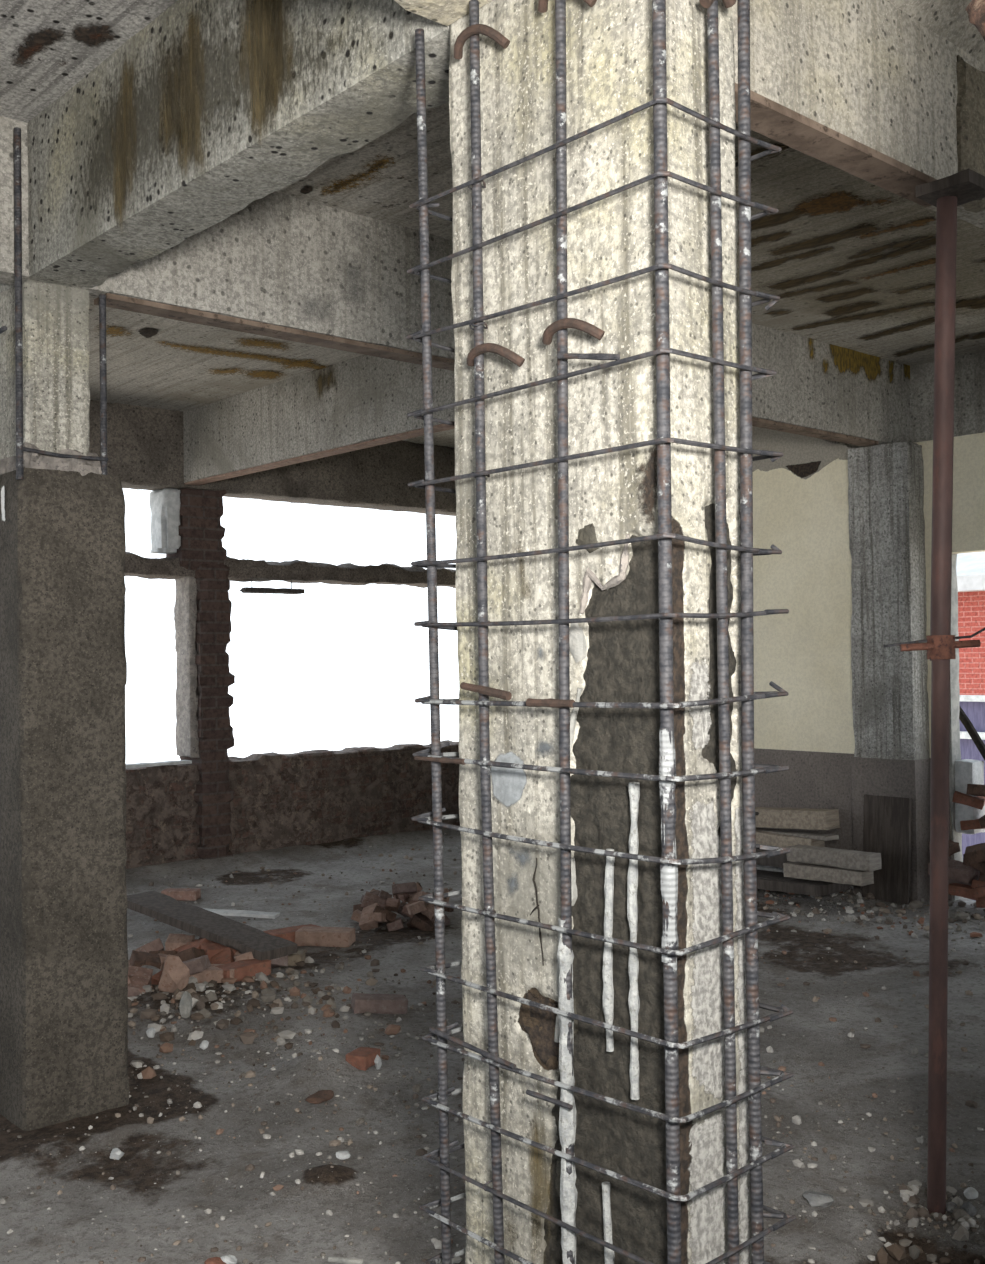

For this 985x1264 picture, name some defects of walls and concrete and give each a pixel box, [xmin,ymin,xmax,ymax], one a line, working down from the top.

water stain [69,0,390,225]
corrosion [316,154,404,194]
corrosion [735,143,789,162]
corrosion [737,191,936,341]
corrosion [956,298,985,310]
corrosion [158,338,330,380]
corrosion [893,344,934,357]
corrosion [955,333,985,344]
peeling [752,426,850,479]
spalling [636,444,657,523]
spalling [702,504,737,801]
spalling [518,516,693,1264]